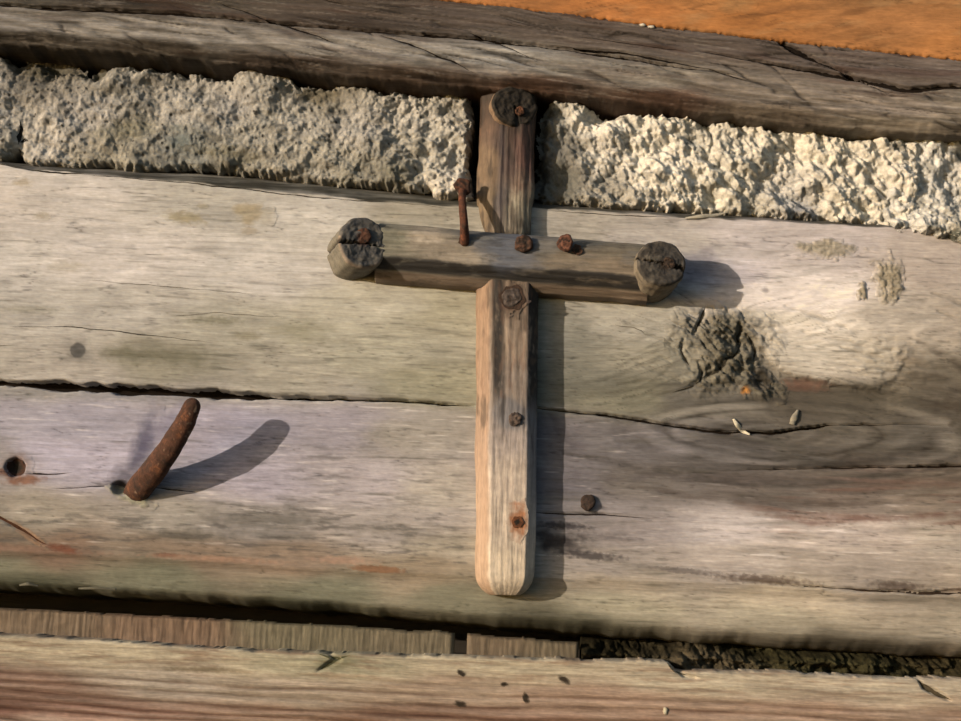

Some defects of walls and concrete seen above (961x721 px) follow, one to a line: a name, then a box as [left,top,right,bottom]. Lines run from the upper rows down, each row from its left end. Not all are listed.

crack [0,0,961,94]
crack [672,305,756,393]
crack [0,381,458,406]
crack [537,408,892,435]
crack [736,464,961,472]
rust [505,498,529,544]